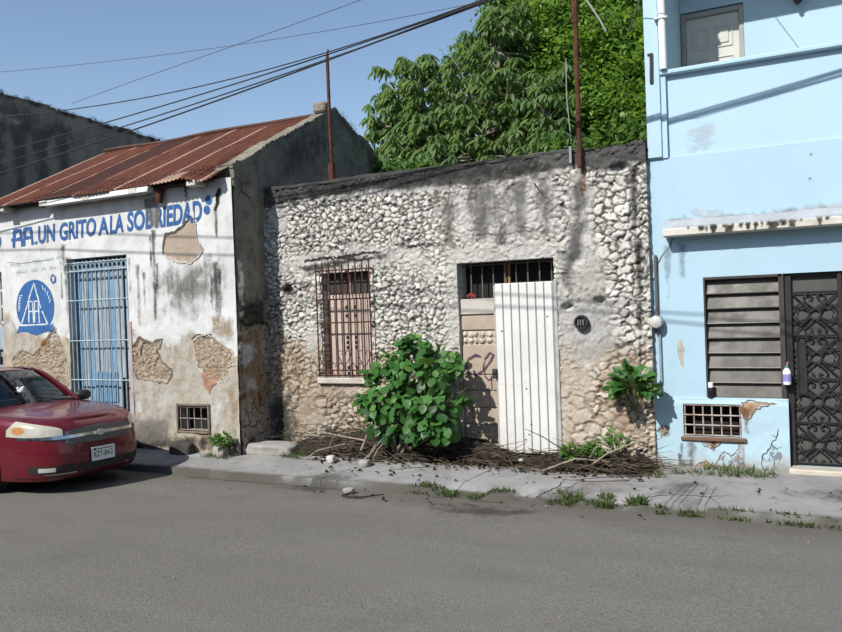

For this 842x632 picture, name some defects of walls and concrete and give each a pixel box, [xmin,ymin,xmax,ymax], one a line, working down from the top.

flaking render [162,215,203,264]
leakage [687,209,802,232]
leakage [137,231,230,335]
flaking render [11,325,69,387]
flaking render [133,336,172,384]
flaking render [192,335,253,393]
peeling [740,400,776,424]
crack [714,429,782,468]